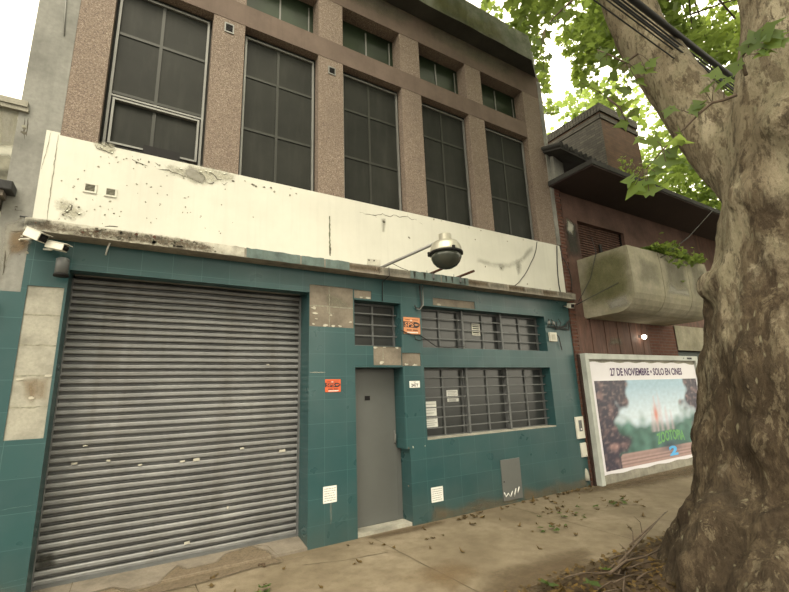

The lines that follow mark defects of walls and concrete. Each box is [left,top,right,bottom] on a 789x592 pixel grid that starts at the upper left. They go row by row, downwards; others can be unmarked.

flaking render [96,144,275,193]
flaking render [13,233,28,255]
peeling [35,198,223,253]